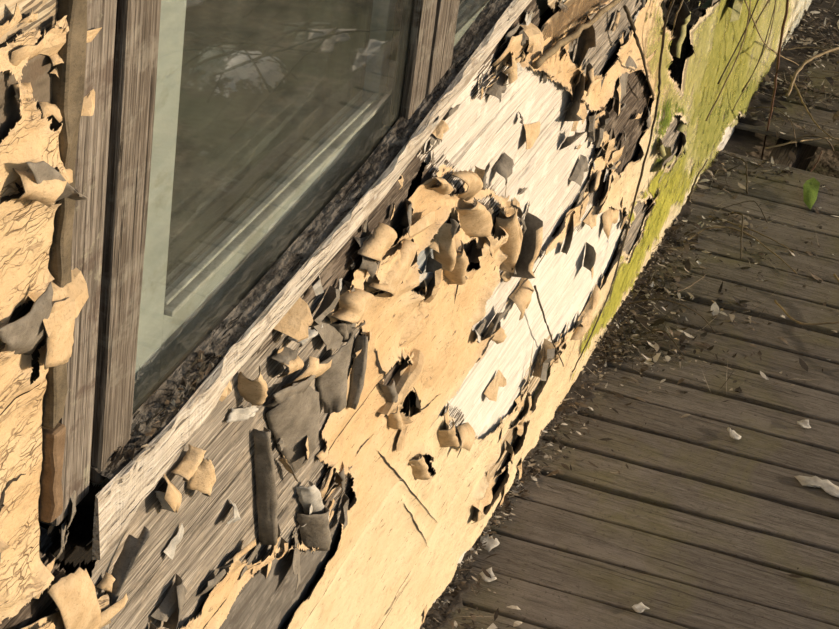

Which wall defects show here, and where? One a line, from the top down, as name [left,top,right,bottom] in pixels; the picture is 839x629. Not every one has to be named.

peeling [660,0,718,58]
peeling [650,115,688,183]
peeling [718,116,738,150]
crack [0,182,25,204]
water stain [581,0,812,360]
peeling [0,0,660,629]
crack [375,348,386,379]
crack [0,474,25,509]
crack [356,436,437,548]